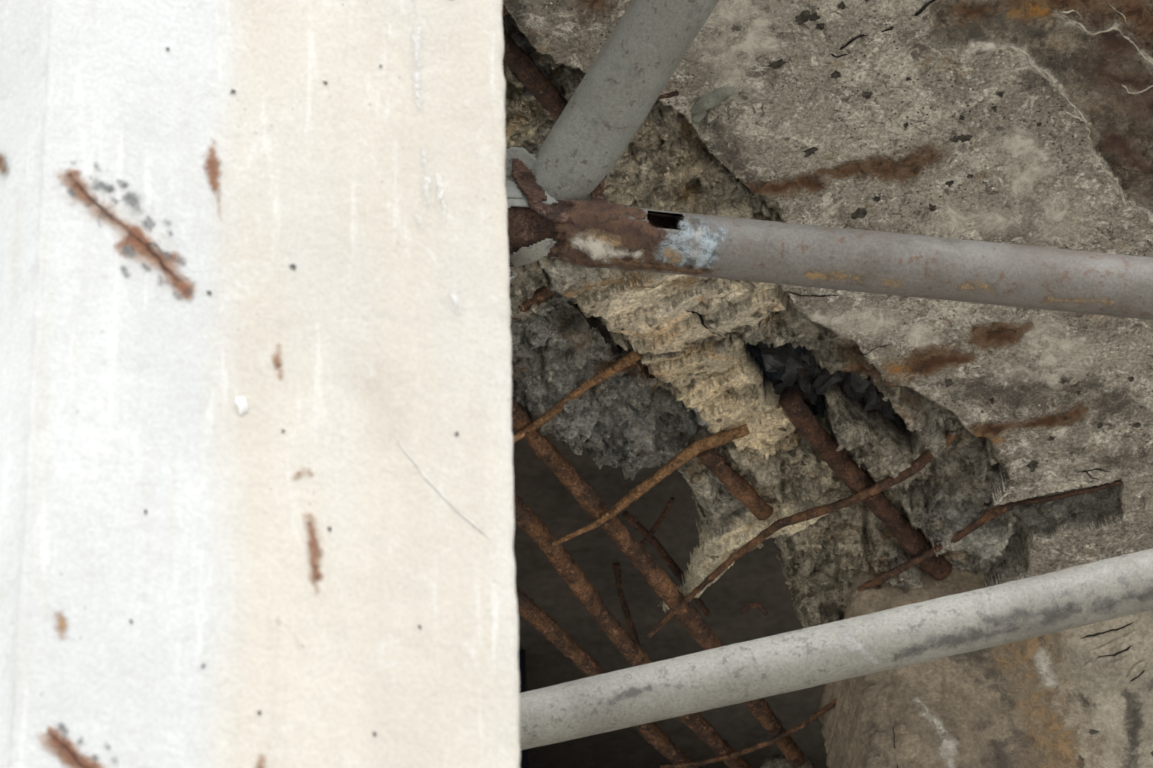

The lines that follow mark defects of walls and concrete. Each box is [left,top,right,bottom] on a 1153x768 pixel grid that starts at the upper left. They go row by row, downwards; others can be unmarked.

spalling [502,3,586,102]
crack [1058,4,1153,95]
spalling [502,62,556,157]
peeling [928,0,1153,216]
rust [206,148,220,200]
spalling [603,100,785,222]
rust [746,147,944,196]
rust [596,357,658,390]
spalling [509,238,1124,629]
rust [968,403,1088,444]
rust [308,515,322,584]
crack [1080,621,1145,681]